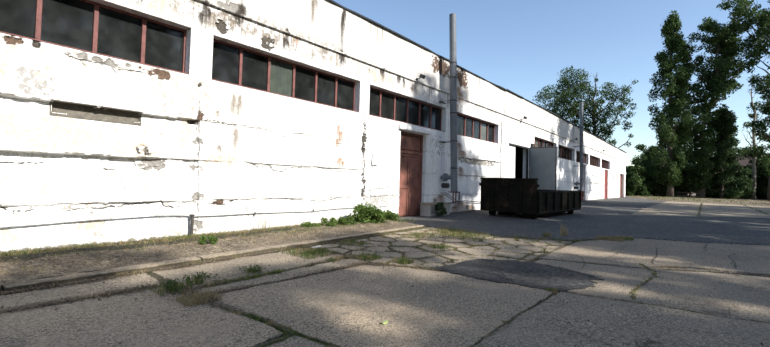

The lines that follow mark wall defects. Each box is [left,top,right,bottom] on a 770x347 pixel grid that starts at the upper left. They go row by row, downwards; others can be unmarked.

spalling [215,0,246,34]
spalling [65,51,171,80]
spalling [431,55,468,89]
spalling [10,65,143,153]
peeling [179,111,204,148]
crack [0,94,249,225]
peeling [113,138,166,171]
crack [246,119,399,204]
crack [563,215,763,299]